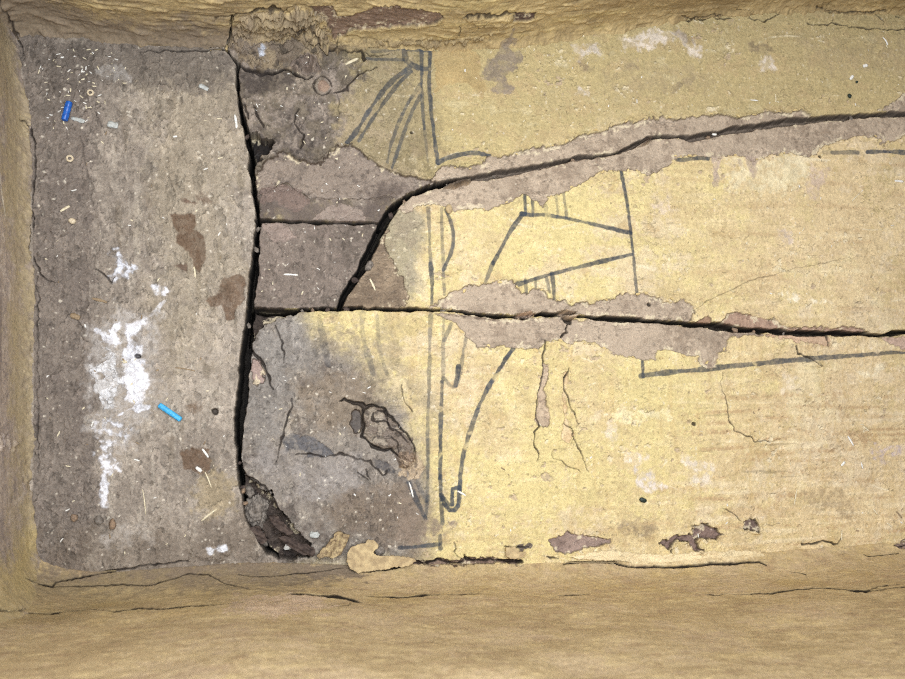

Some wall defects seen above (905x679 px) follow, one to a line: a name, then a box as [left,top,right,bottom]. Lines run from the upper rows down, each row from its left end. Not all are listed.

peeling [312,5,443,38]
peeling [255,93,905,222]
crack [19,119,56,472]
damp [107,247,139,284]
peeling [343,229,410,309]
crack [139,4,905,526]
peeling [430,279,865,369]
damp [72,283,175,508]
crack [0,541,768,615]
flaking render [548,523,765,567]
crack [707,571,905,596]
crack [801,537,843,546]